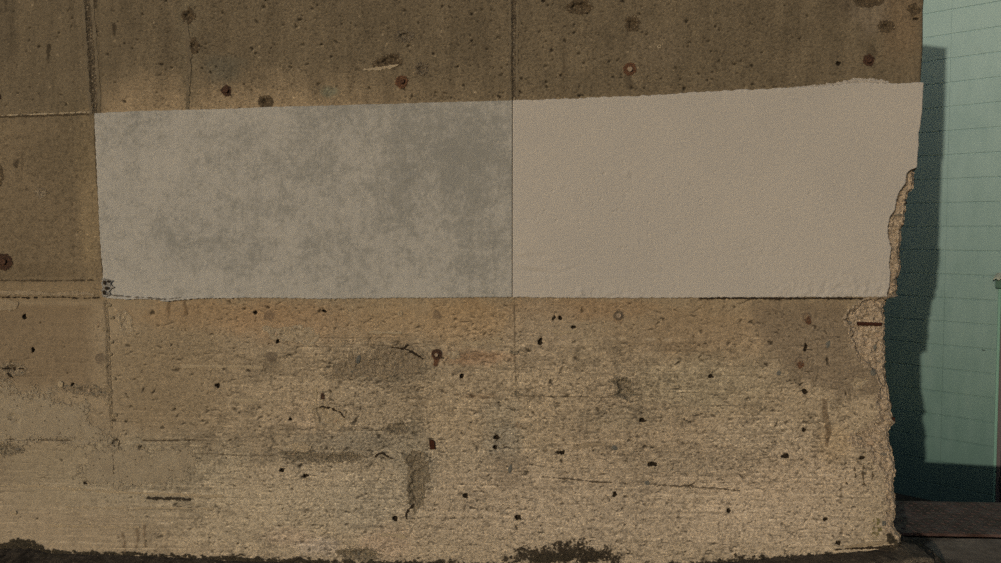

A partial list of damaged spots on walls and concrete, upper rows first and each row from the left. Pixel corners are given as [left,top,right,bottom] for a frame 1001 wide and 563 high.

rust [431,349,442,366]
spalling [842,168,916,540]
damp [0,538,622,563]
damp [669,552,832,563]